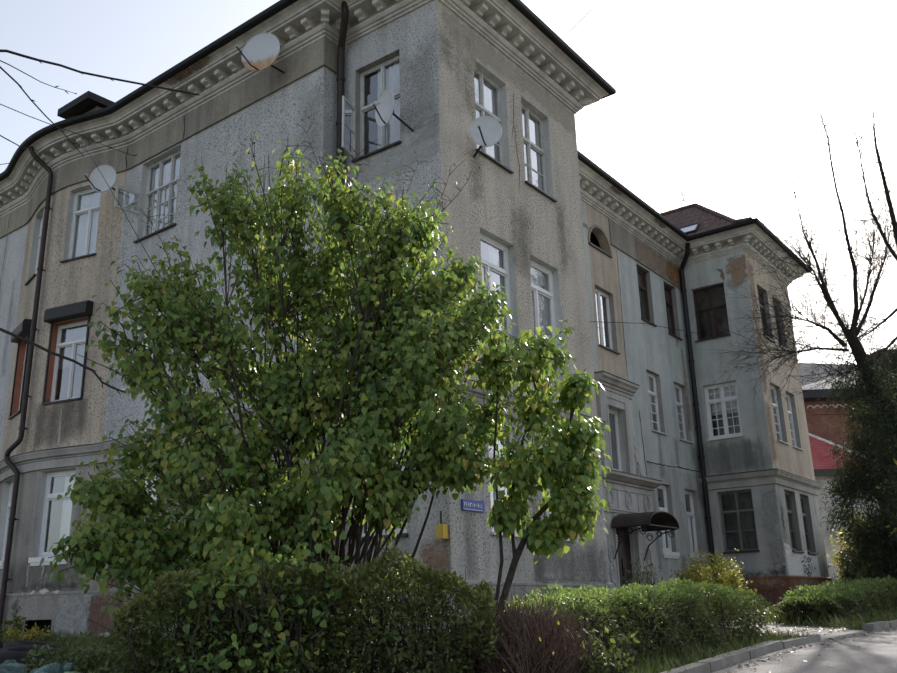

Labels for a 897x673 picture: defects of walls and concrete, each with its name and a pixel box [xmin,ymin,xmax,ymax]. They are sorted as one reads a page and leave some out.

peeling [717,255,766,391]